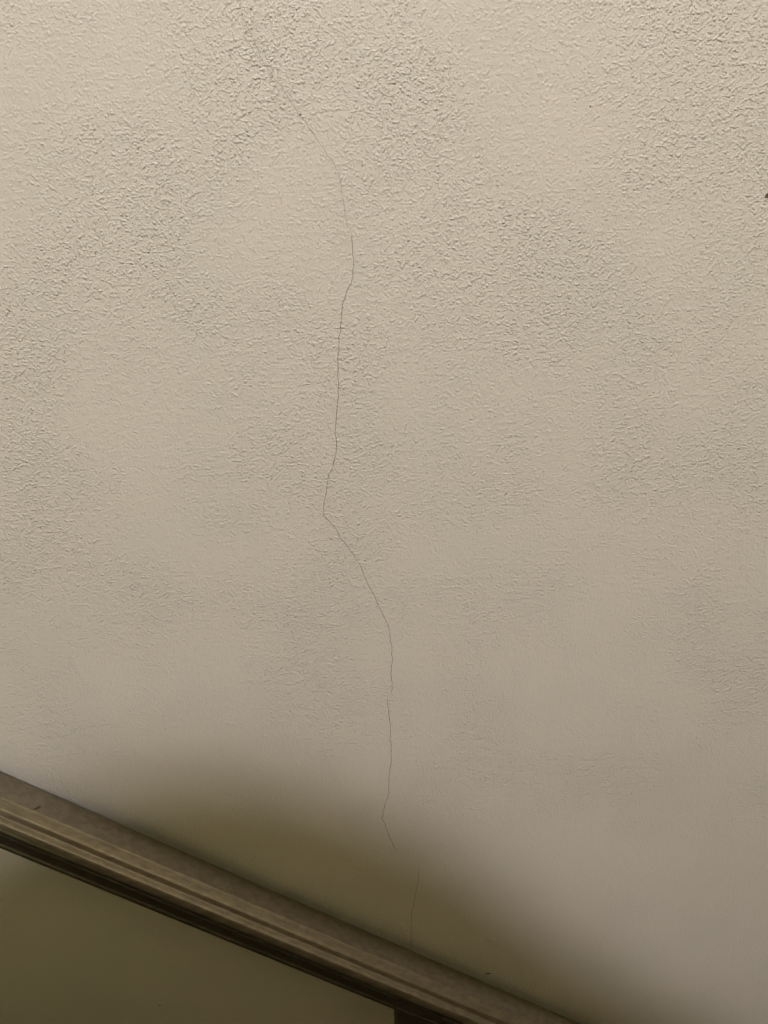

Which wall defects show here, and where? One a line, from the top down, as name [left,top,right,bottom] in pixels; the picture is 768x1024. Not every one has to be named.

crack [240,5,396,850]